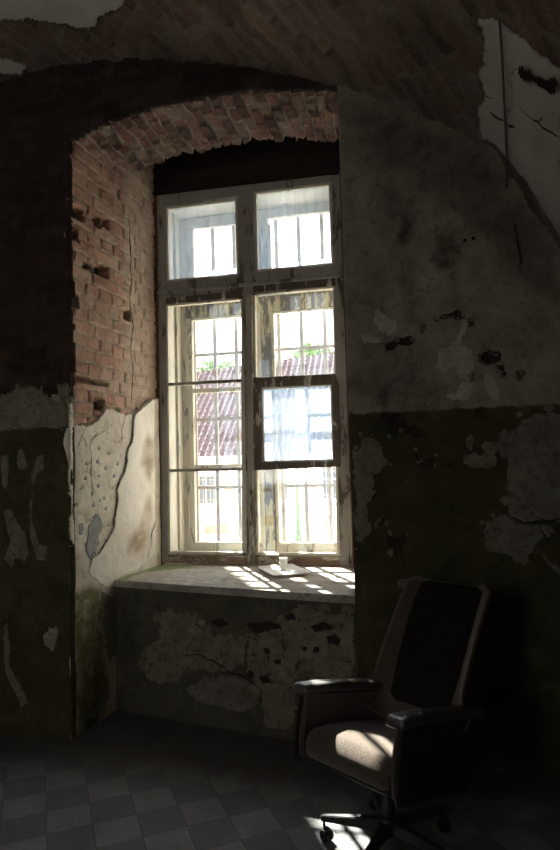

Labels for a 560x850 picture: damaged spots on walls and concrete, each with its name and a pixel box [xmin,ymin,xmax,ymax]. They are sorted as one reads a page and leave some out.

spalling [518,65,559,95]
spalling [0,142,157,566]
crack [78,225,134,566]
peeling [360,307,526,405]
peeling [352,432,392,550]
peeling [463,404,560,533]
peeling [2,617,28,707]
peeling [43,627,58,651]
peeling [137,604,355,730]